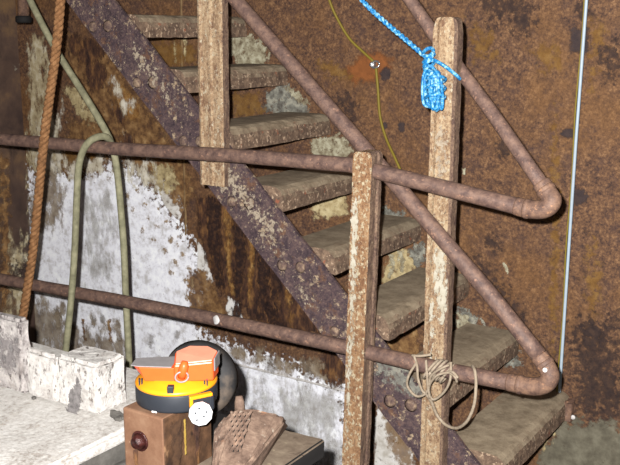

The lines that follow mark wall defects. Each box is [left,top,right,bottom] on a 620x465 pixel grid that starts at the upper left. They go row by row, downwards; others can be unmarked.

peeling [25,33,50,136]
peeling [49,112,62,138]
rust [63,31,170,145]
rust [318,53,389,83]
peeling [26,148,39,243]
peeling [34,149,213,307]
rust [56,151,321,334]
rust [311,195,348,219]
peeling [29,196,360,465]
rust [217,344,264,364]
rust [273,350,345,388]